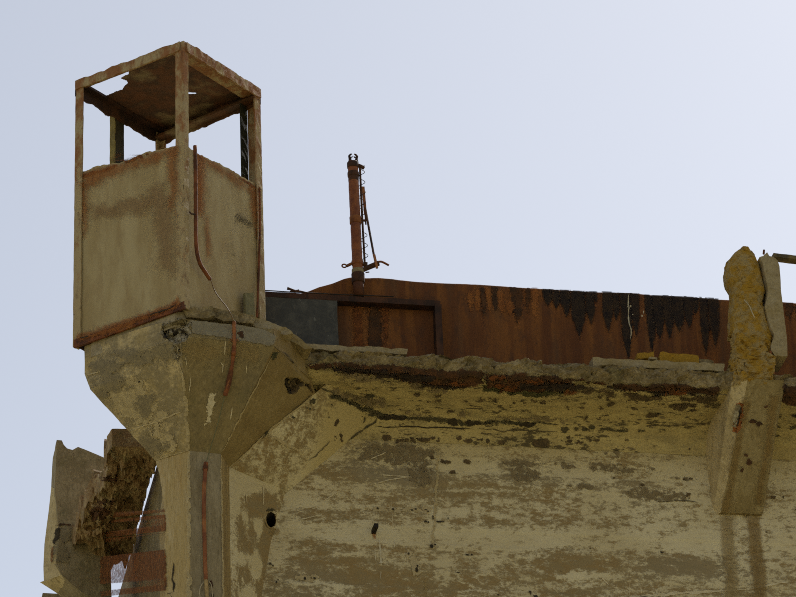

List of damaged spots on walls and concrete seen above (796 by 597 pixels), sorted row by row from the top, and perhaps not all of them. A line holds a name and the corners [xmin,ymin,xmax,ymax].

corrosion [83,149,176,192]
corrosion [197,153,257,220]
corrosion [78,298,180,340]
corrosion [352,306,390,347]
corrosion [468,286,538,323]
spalling [285,378,313,394]
leakage [330,383,386,417]
spalling [305,348,734,393]
peeling [87,318,193,559]
crack [630,582,790,597]